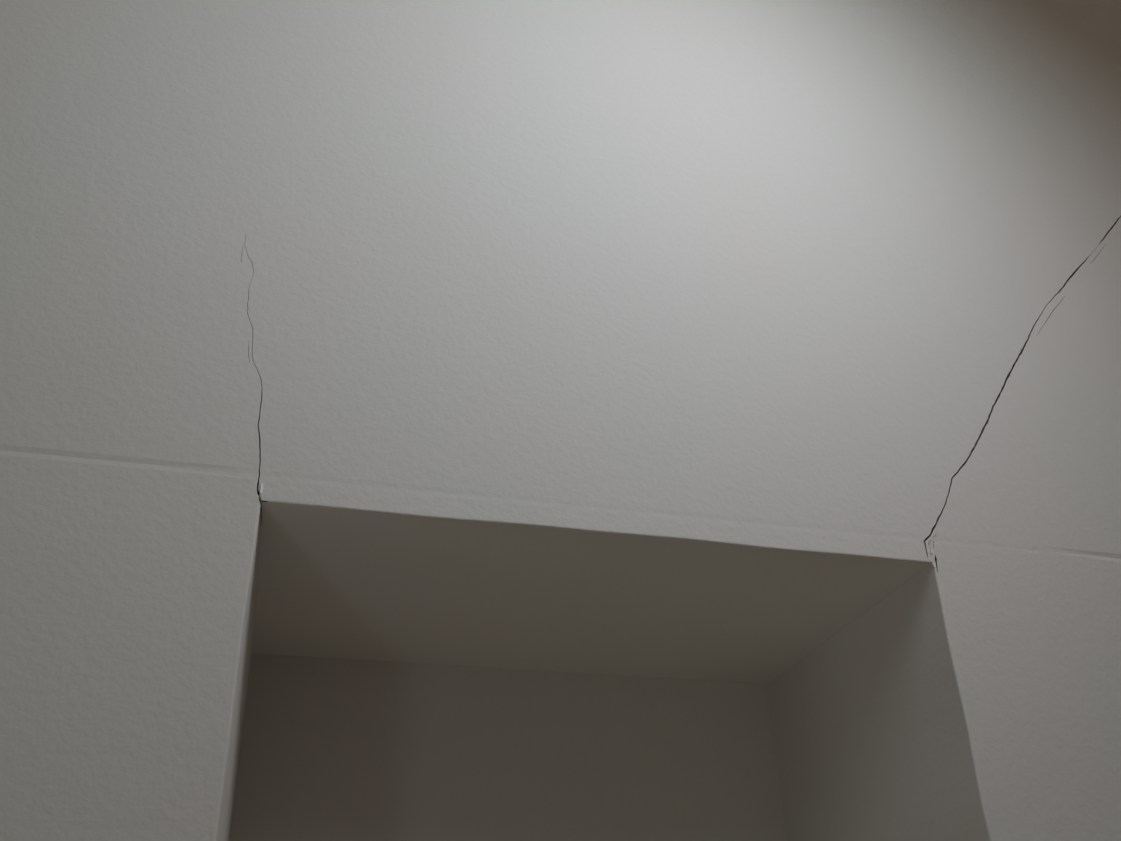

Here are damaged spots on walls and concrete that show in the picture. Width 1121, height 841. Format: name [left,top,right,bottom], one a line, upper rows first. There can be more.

crack [241,235,268,523]
crack [922,216,1121,572]